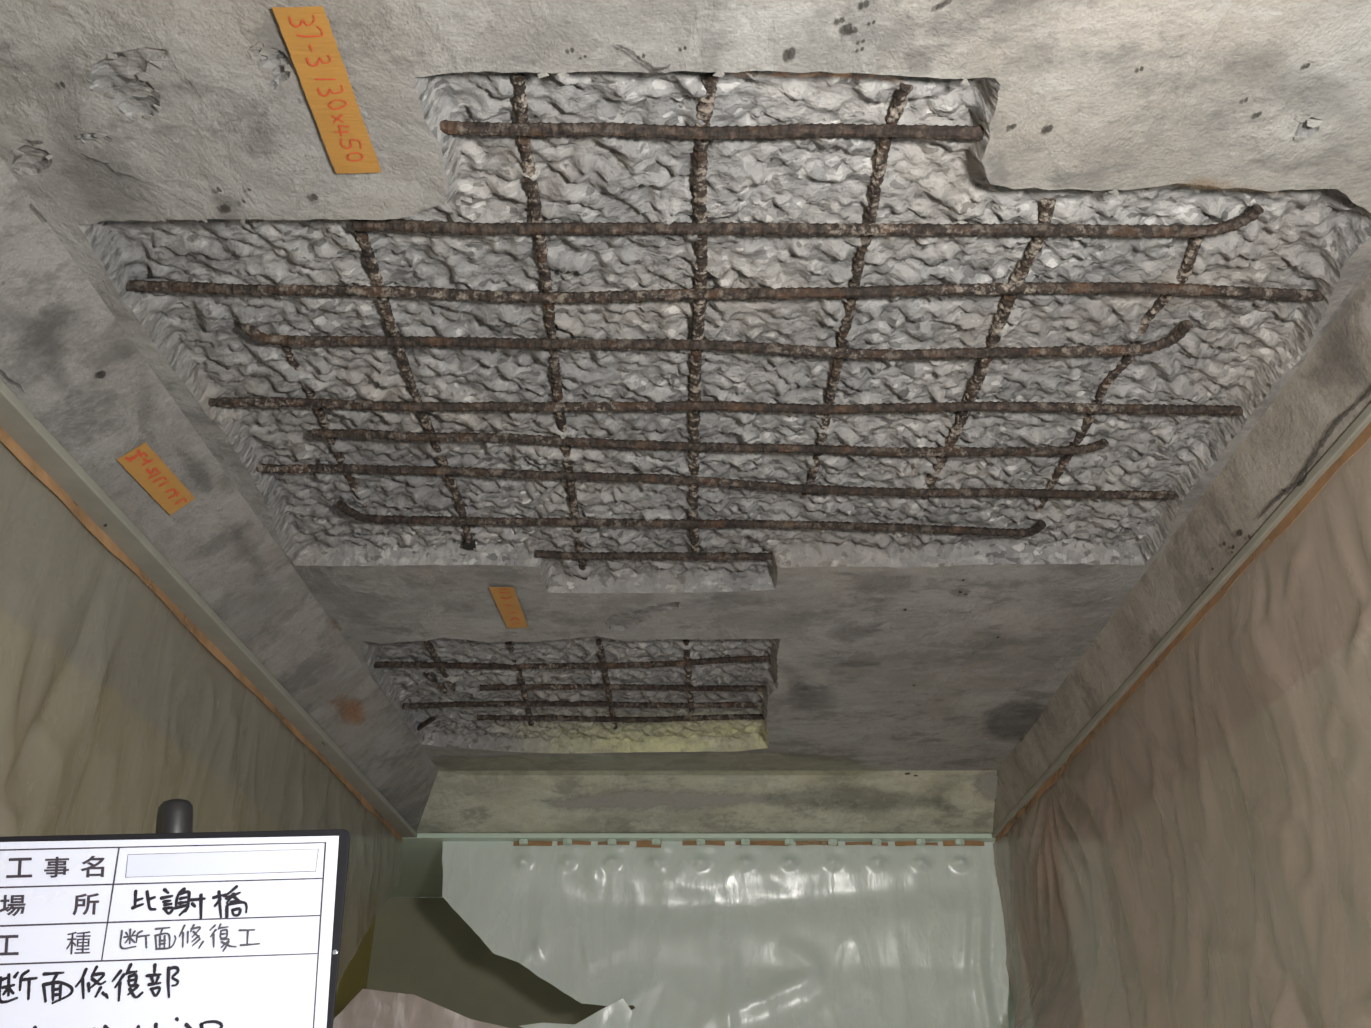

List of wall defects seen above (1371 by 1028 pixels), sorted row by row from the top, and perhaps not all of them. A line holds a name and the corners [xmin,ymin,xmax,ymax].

spalling [73,42,1371,754]